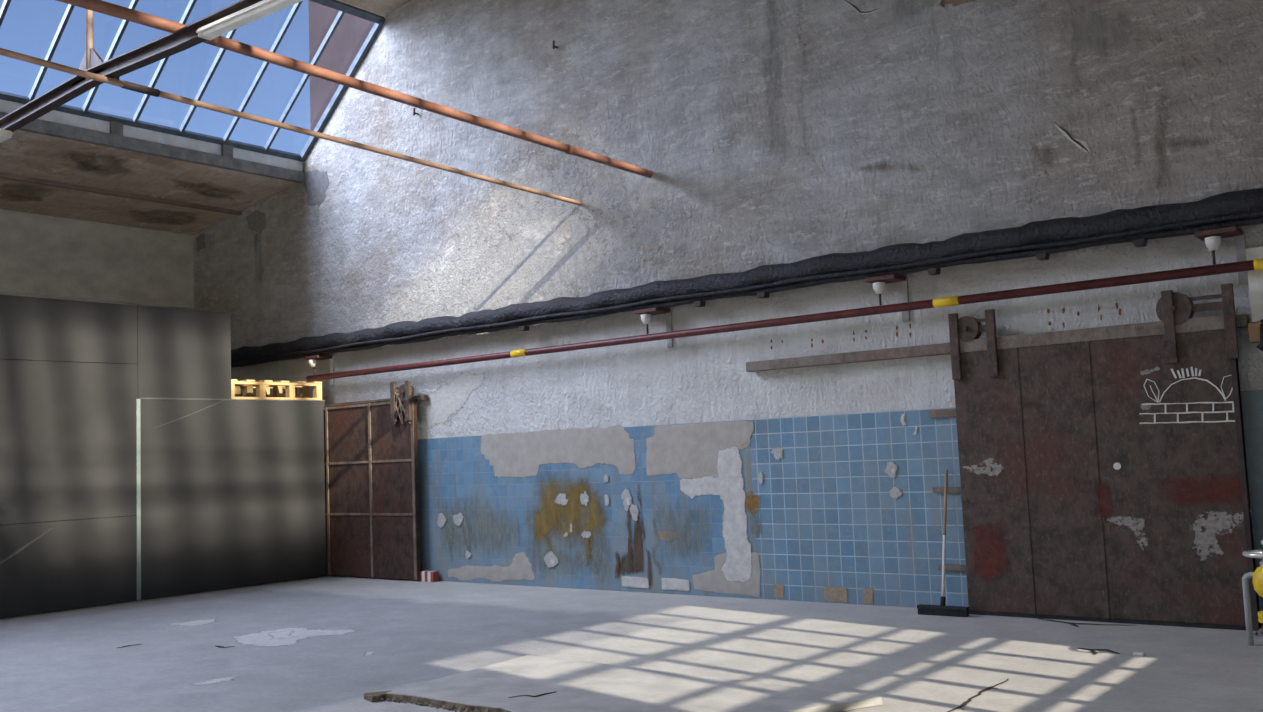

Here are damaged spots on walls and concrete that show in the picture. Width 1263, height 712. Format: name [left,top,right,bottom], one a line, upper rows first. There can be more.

crack [844,0,880,18]
peeling [480,420,754,521]
peeling [437,512,464,528]
corrosion [534,480,602,559]
corrosion [745,494,760,534]
flaking render [448,550,558,582]
peeling [621,552,784,598]